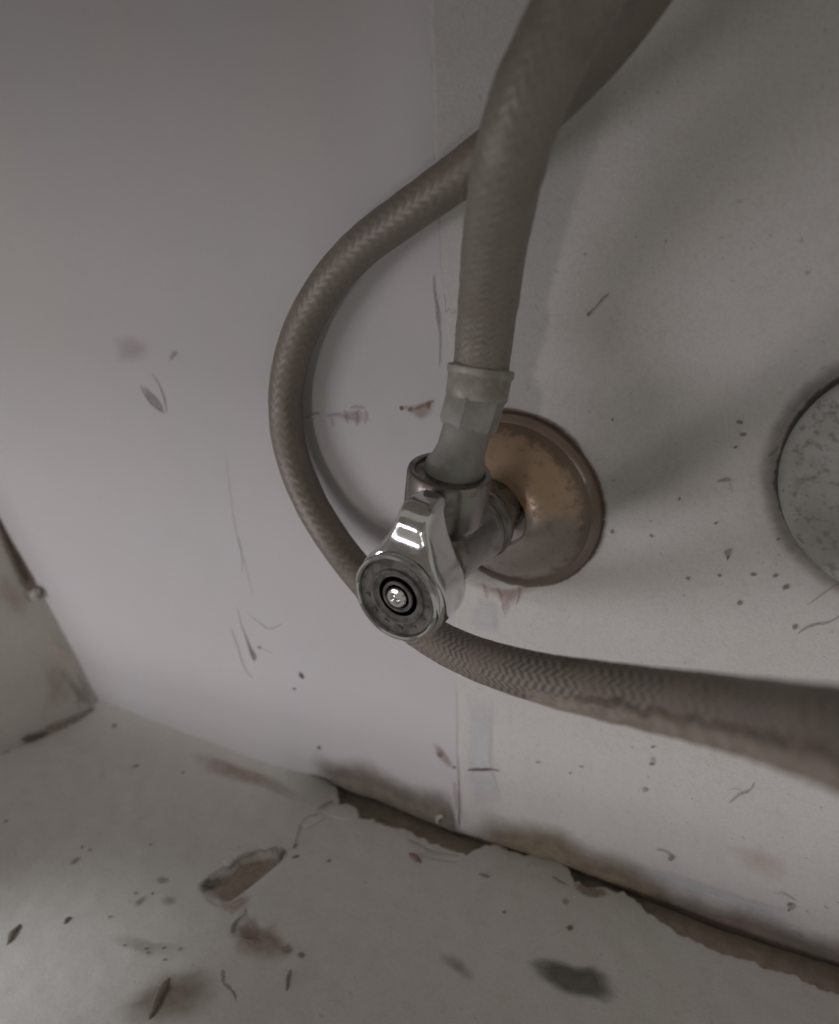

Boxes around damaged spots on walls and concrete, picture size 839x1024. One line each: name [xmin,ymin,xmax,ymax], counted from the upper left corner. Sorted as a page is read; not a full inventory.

corrosion [477,409,605,587]
spalling [301,800,359,830]
spalling [204,843,291,951]